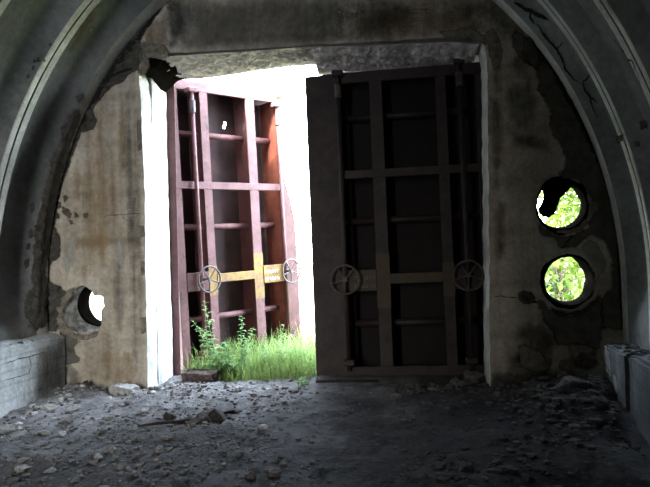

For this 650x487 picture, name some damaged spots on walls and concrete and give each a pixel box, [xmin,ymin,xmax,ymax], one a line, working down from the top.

spalling [24,13,503,340]
crack [514,2,611,206]
damp [604,347,618,393]
crack [615,234,623,330]